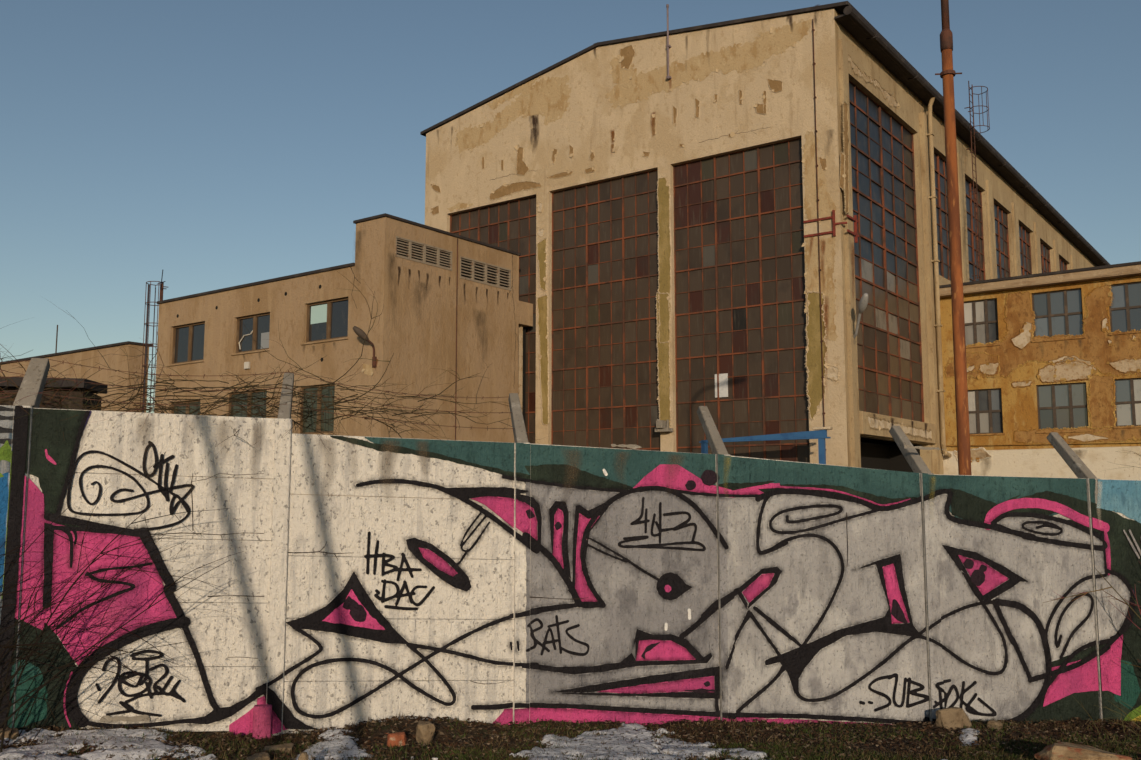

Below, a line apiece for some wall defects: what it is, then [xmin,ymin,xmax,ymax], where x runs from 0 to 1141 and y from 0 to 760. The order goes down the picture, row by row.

peeling [455,75,571,170]
peeling [605,19,812,109]
peeling [738,78,784,115]
peeling [489,144,595,213]
peeling [536,227,550,426]
peeling [944,283,1141,446]